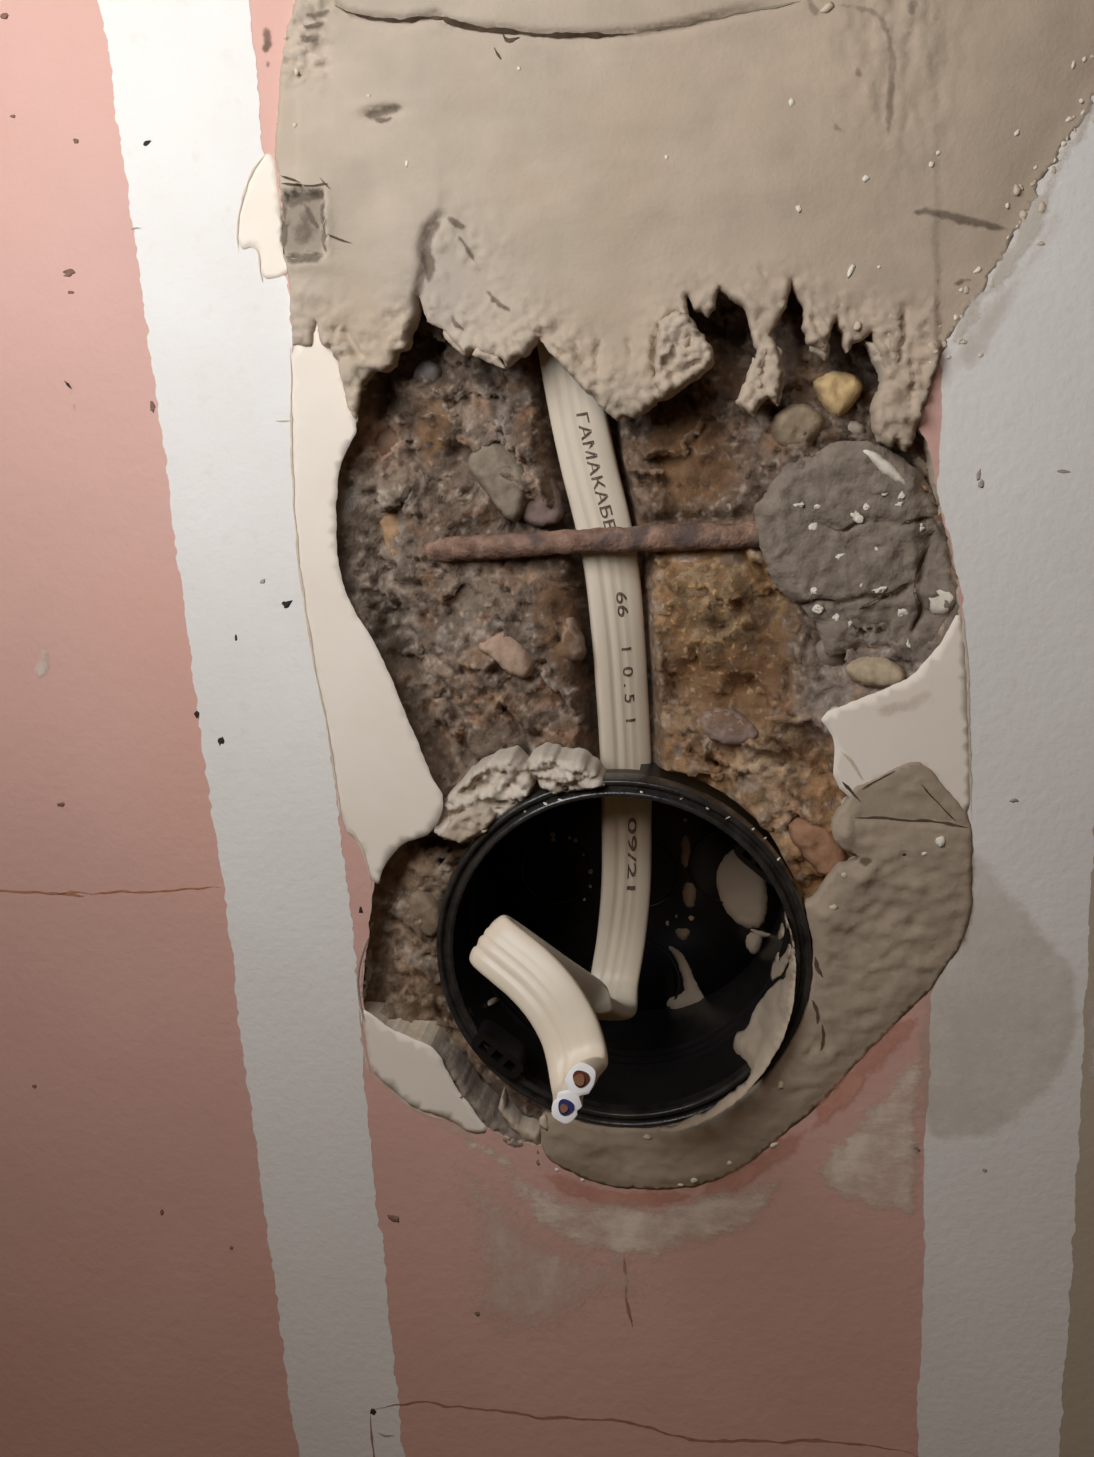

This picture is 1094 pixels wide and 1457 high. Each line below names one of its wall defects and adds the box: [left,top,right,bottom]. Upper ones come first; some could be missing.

crack [335,1,798,59]
peeling [863,450,906,484]
spalling [424,521,760,562]
peeling [280,323,443,888]
peeling [821,590,972,819]
crack [0,887,207,896]
peeling [359,1010,486,1134]
peeling [498,1087,541,1146]
crack [370,1401,918,1457]